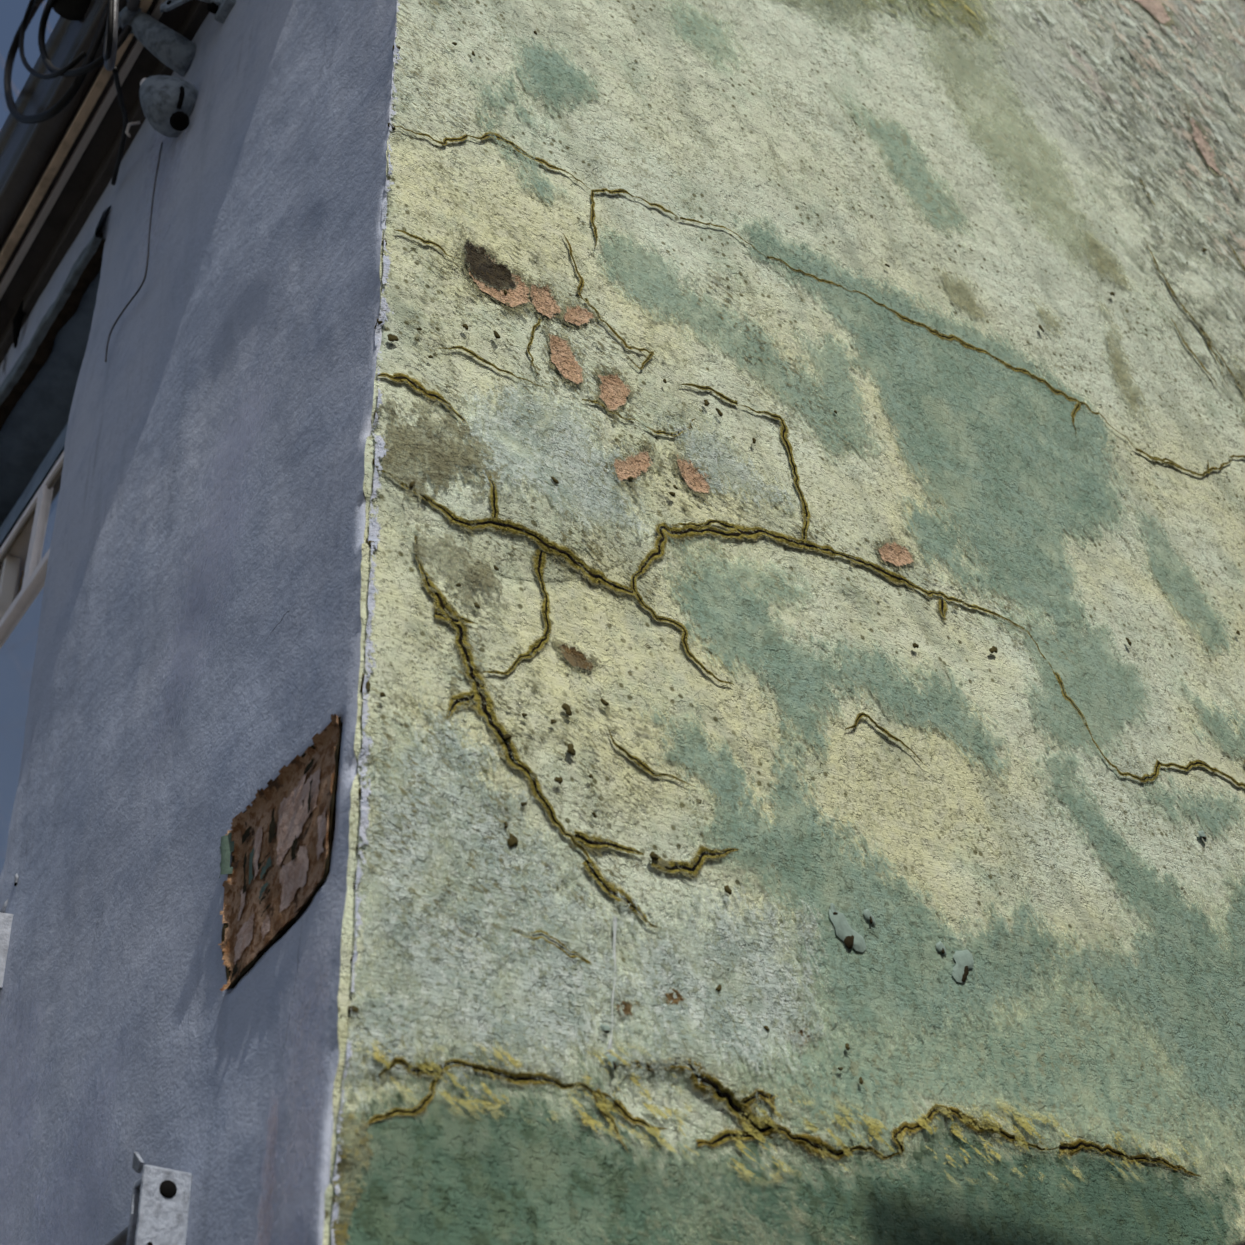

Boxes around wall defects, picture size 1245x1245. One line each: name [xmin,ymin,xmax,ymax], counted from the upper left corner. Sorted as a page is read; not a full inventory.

water stain [665,0,739,69]
water stain [845,99,970,238]
peeling [1014,0,1245,403]
crack [376,372,470,428]
spalling [455,223,639,420]
spalling [605,437,720,501]
crack [394,126,1245,476]
water stain [330,211,1245,1245]
crack [376,383,1245,929]
spalling [218,714,343,992]
crack [354,1055,1201,1177]